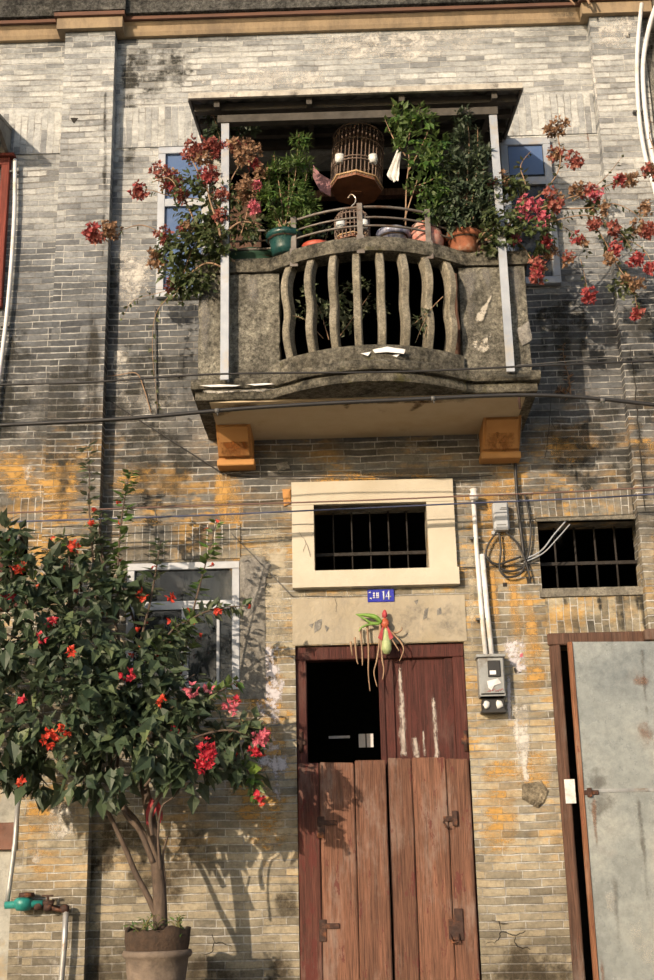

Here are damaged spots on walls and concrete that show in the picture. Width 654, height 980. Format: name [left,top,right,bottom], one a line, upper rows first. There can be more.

leakage [316,32,475,61]
leakage [122,47,193,108]
leakage [222,70,325,87]
leakage [533,300,588,376]
leakage [624,299,654,414]
leakage [545,401,621,491]
leakage [603,431,652,482]
crack [486,921,531,950]